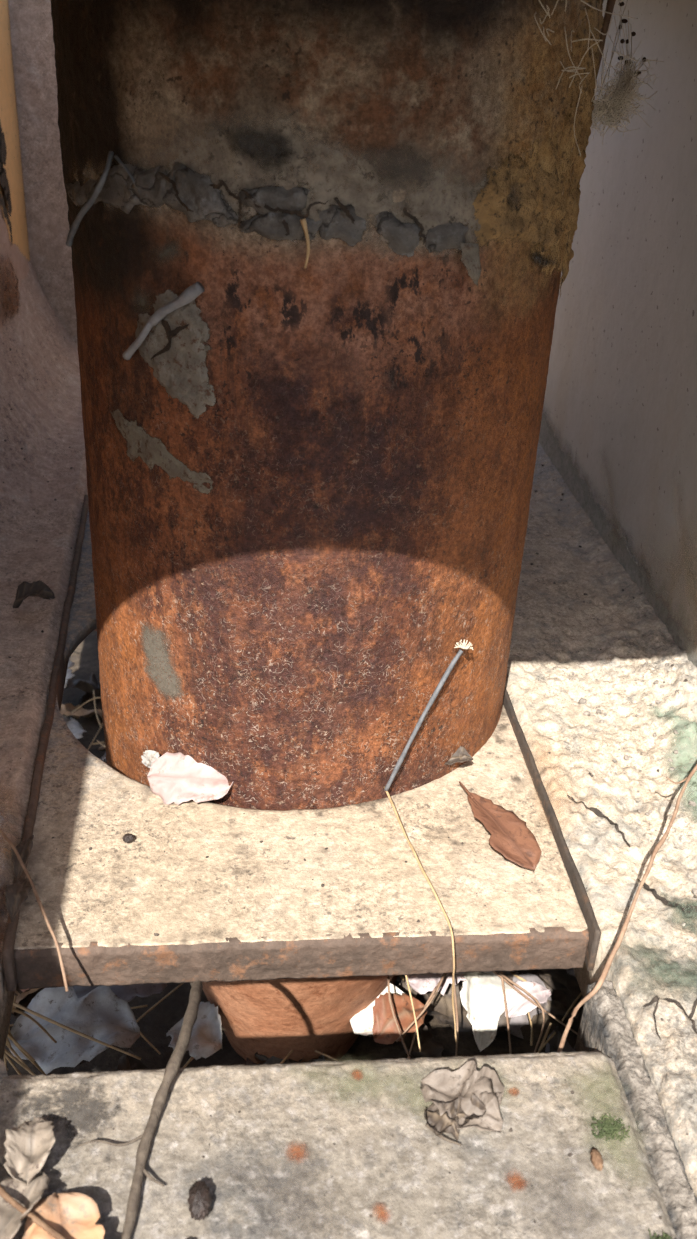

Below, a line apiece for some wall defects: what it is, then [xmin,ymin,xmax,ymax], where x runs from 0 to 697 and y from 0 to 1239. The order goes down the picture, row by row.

corrosion [0,260,20,318]
peeling [0,204,29,333]
water stain [539,413,697,667]
crack [643,995,697,1041]